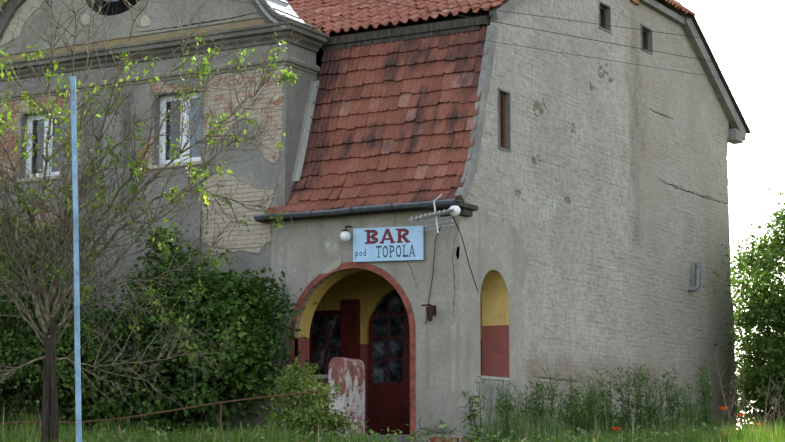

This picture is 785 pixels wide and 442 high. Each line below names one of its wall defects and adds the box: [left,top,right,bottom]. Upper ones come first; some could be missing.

flaking render [133,65,286,177]
crack [661,181,722,203]